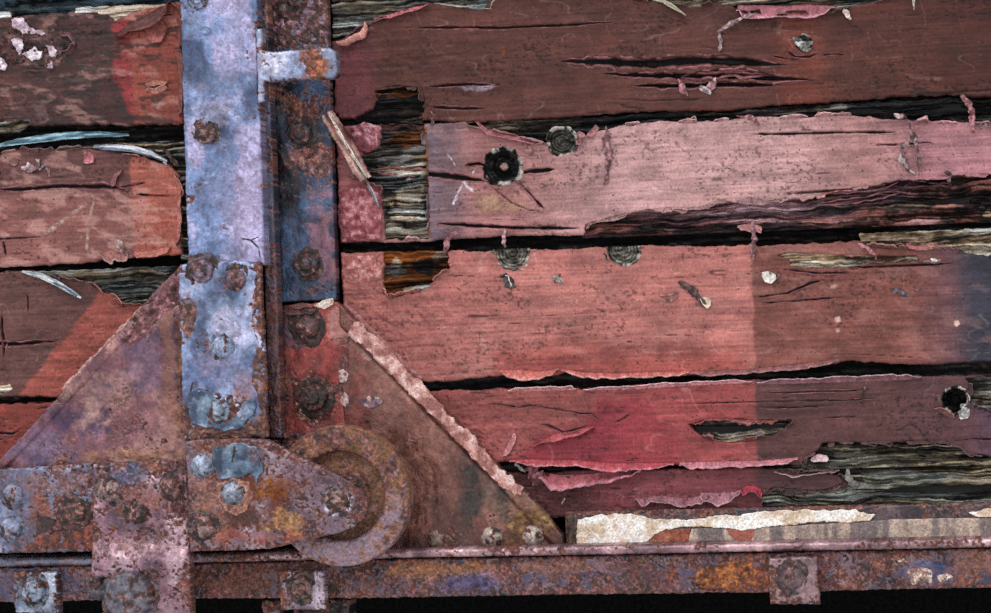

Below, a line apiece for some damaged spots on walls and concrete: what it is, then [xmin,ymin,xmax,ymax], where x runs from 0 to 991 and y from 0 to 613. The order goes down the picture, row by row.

peeling [0,11,77,69]
rust [272,0,326,79]
crack [555,49,849,91]
peeling [635,0,889,52]
peeling [0,119,189,306]
crack [368,161,575,231]
peeling [466,94,991,269]
rust [120,271,269,439]
peeling [347,321,991,543]
rust [216,477,284,516]
rust [505,508,578,544]
rust [696,562,758,591]